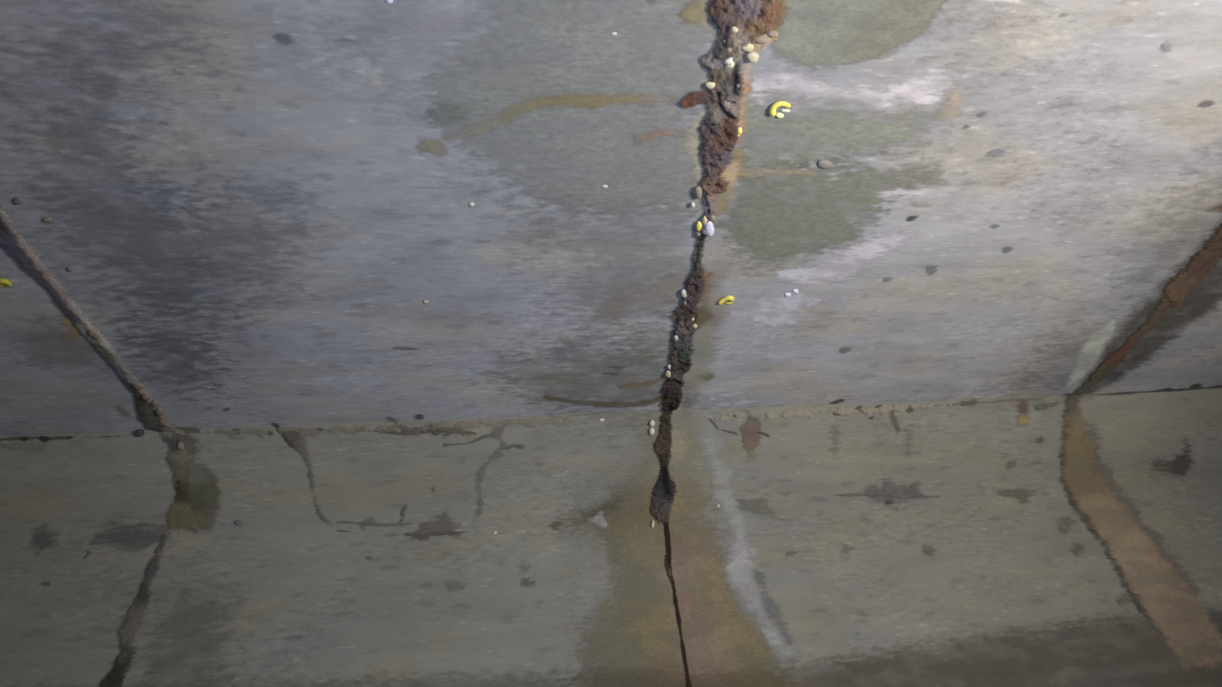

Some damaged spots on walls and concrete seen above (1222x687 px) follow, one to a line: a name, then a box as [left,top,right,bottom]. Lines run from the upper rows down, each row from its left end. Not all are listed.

crack [0,206,574,687]
water stain [356,0,714,231]
water stain [716,0,950,329]
crack [649,0,1222,687]